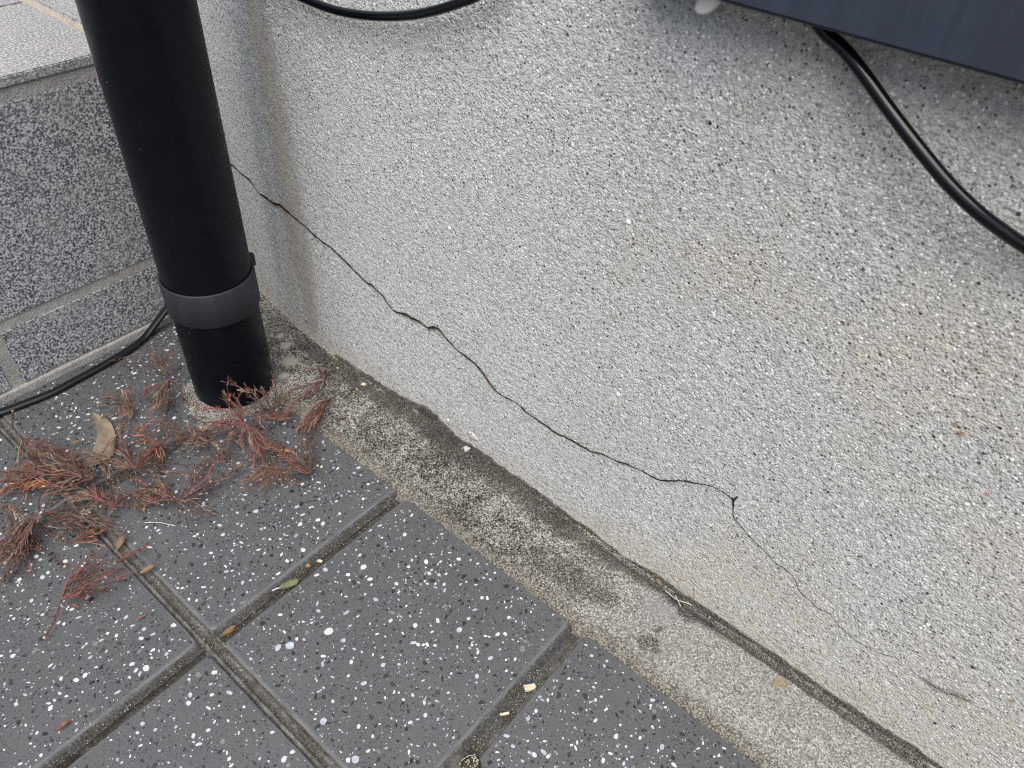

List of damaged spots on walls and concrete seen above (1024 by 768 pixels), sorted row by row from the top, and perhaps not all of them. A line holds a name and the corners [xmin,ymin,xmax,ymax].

crack [231,164,971,702]